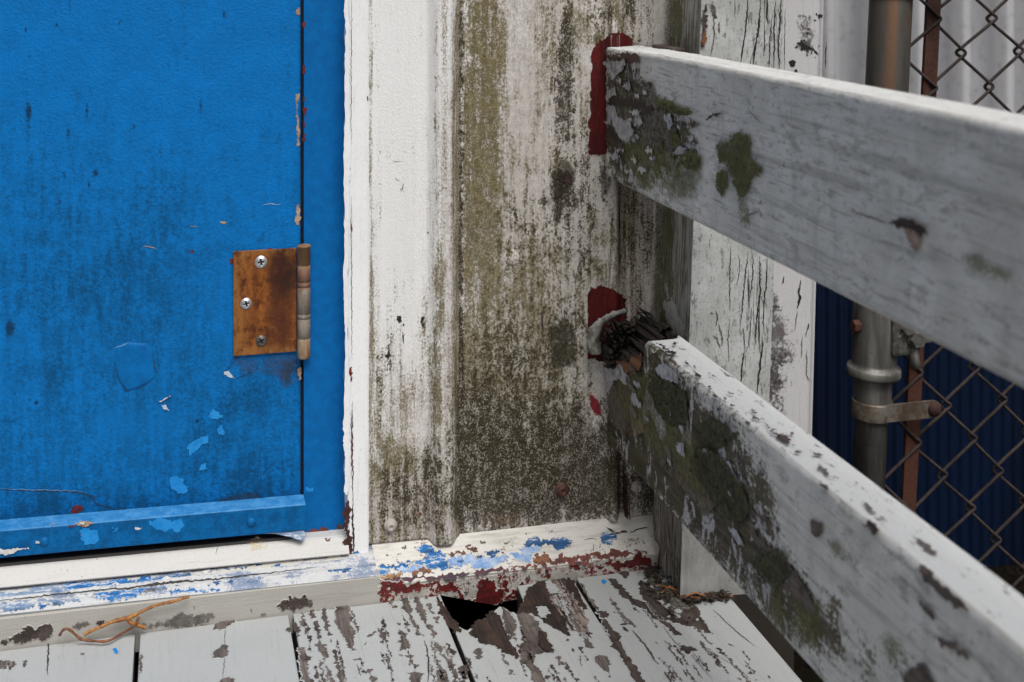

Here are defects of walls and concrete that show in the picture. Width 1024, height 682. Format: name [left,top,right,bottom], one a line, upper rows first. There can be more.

crack [734,0,786,70]
peeling [0,0,359,612]
water stain [550,324,575,370]
crack [711,246,812,391]
water stain [769,294,792,413]
peeling [378,536,573,577]
peeling [851,495,893,535]
peeling [916,530,937,556]
peeling [915,564,969,612]
peeling [276,593,492,682]
peeling [501,567,730,682]
peeling [902,663,934,682]